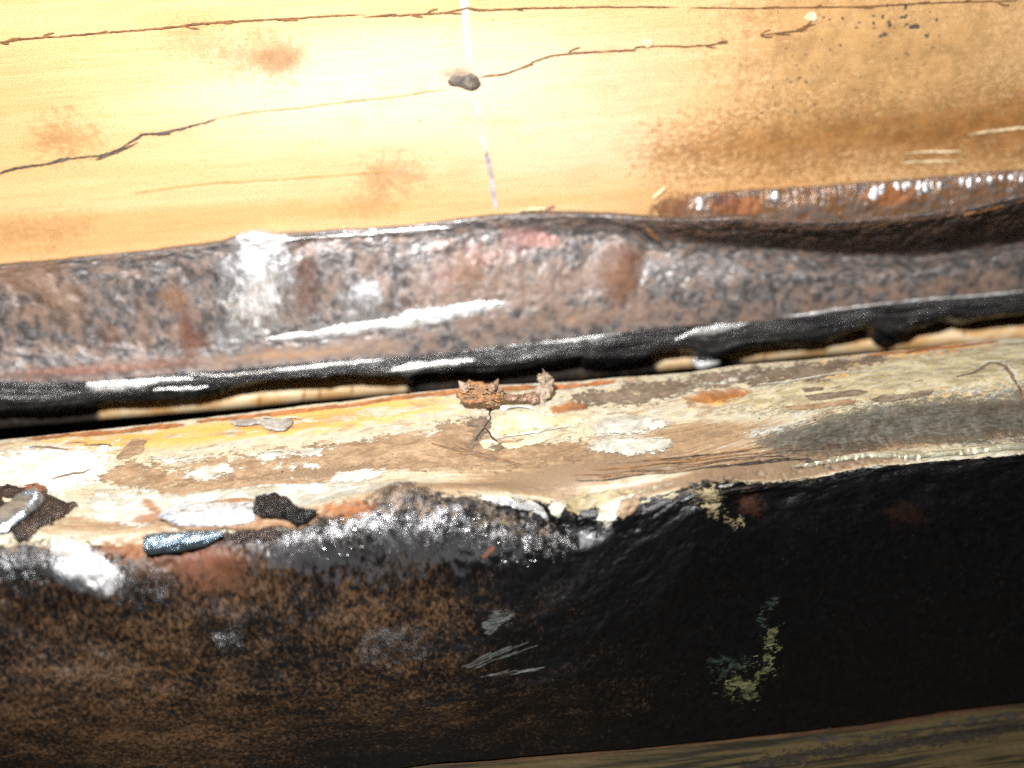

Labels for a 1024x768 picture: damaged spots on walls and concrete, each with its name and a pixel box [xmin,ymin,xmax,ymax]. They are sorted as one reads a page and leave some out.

crack [0,0,1018,44]
mould [855,4,944,48]
crack [481,40,727,77]
crack [0,90,438,174]
damp [629,48,1024,188]
rust [2,319,206,383]
rust [868,341,998,356]
peeling [0,342,1024,567]